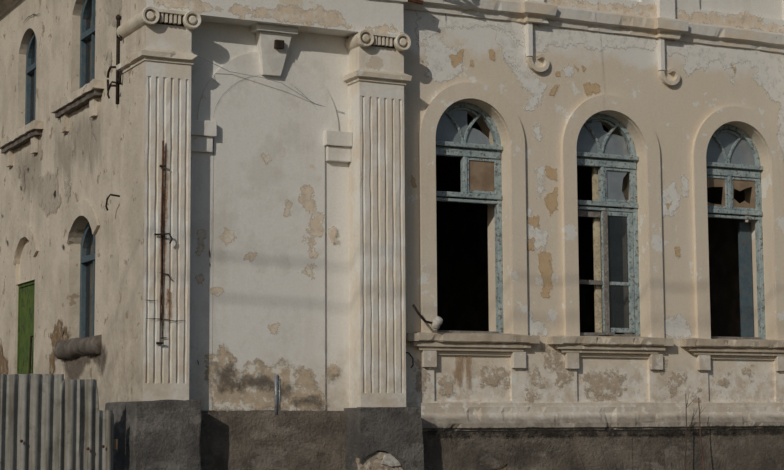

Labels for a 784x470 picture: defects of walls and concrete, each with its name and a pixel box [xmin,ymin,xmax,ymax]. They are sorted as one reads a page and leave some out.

flaking render [153,0,352,30]
flaking render [675,8,784,33]
peeling [424,32,474,83]
peeling [533,166,558,214]
rust [162,148,171,317]
flaking render [283,184,339,279]
peeling [526,215,553,298]
leakage [205,345,339,411]
flaking render [414,360,456,397]
flaking render [480,365,511,388]
flaking render [524,311,626,403]
spalling [356,451,403,470]